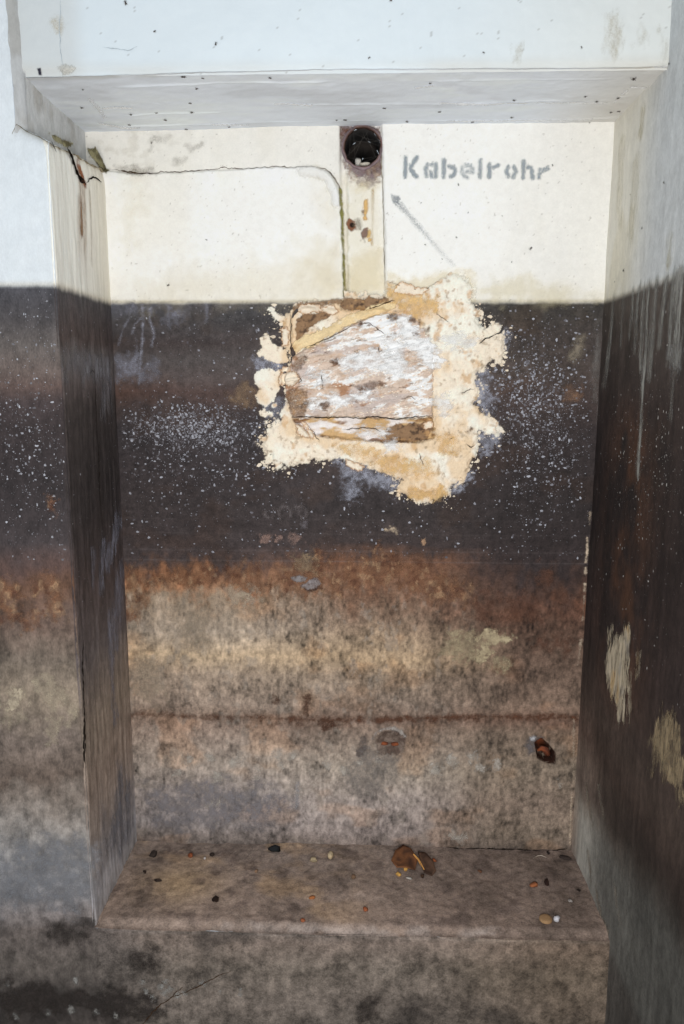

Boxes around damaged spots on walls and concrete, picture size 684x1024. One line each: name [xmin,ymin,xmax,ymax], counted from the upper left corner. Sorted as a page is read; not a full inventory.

crack [52,135,342,195]
corrosion [343,158,381,241]
spalling [254,272,516,509]
damp [631,267,683,479]
corrosion [124,544,471,621]
crack [80,644,88,768]
spalling [526,736,556,763]
peeling [606,625,631,722]